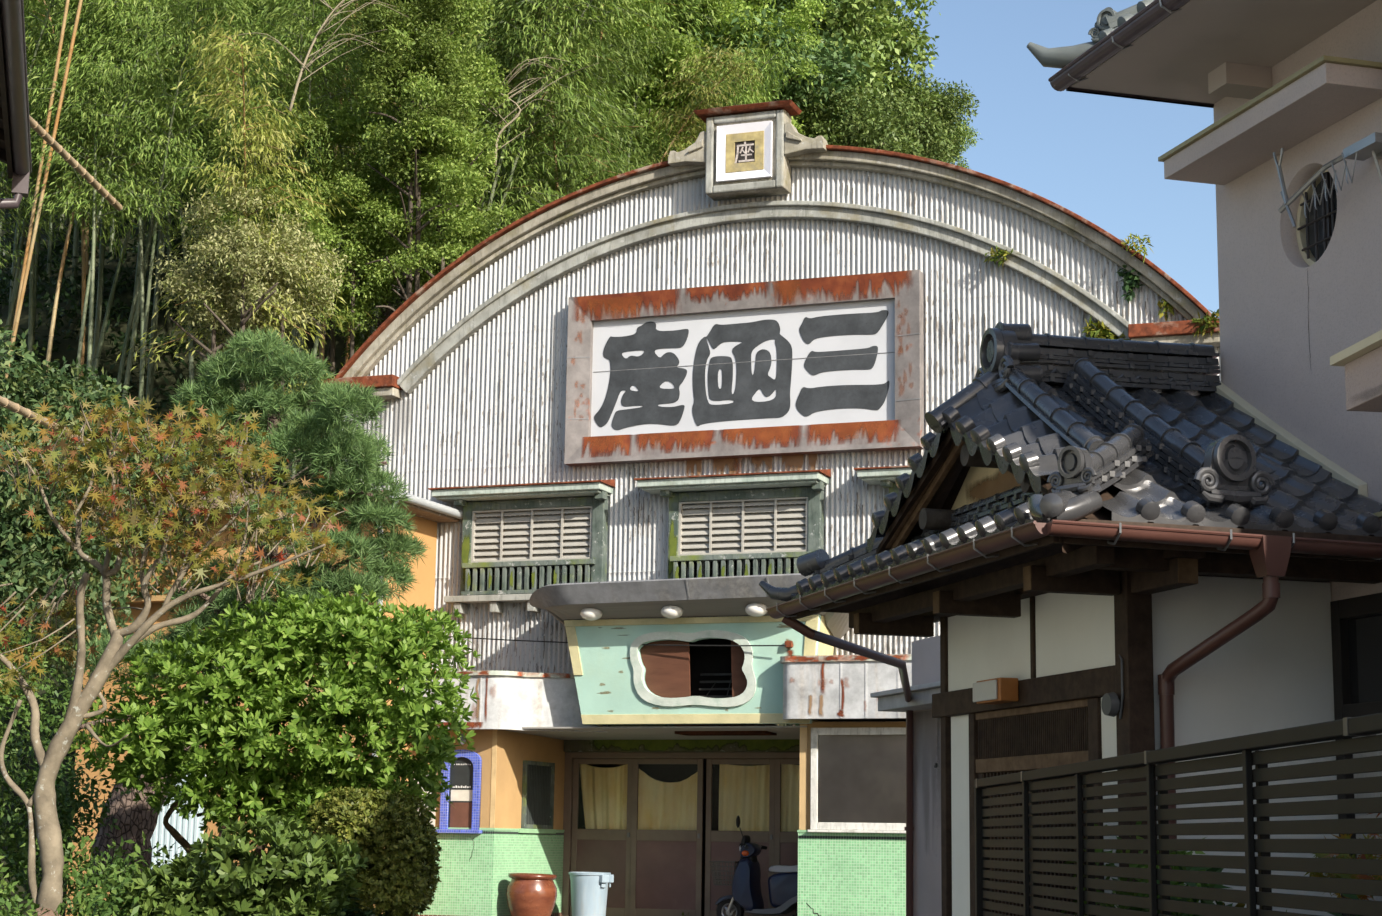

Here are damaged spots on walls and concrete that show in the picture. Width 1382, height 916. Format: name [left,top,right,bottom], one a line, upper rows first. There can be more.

corrosion [575,270,910,320]
corrosion [582,420,899,476]
corrosion [785,639,870,717]